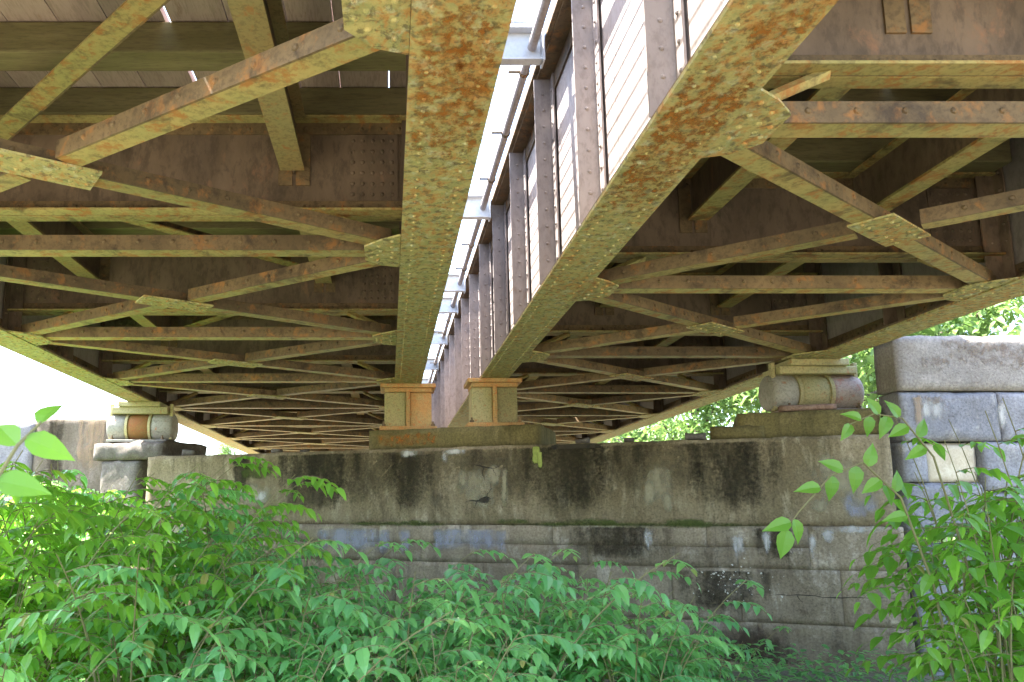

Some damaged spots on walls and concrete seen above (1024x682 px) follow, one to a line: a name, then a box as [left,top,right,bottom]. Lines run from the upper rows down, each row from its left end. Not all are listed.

rust [411,0,500,167]
rust [594,0,828,219]
leakage [288,446,638,508]
leakage [664,442,758,508]
leakage [696,571,752,608]
crack [758,593,864,601]